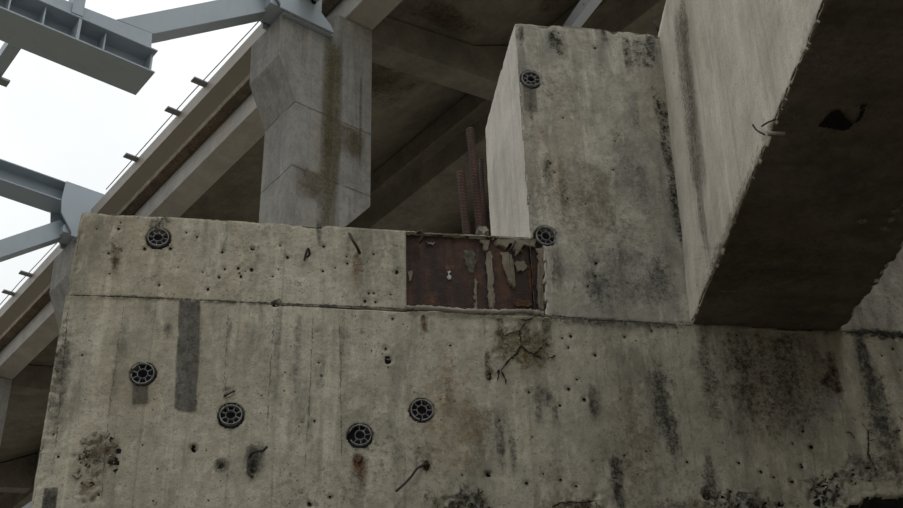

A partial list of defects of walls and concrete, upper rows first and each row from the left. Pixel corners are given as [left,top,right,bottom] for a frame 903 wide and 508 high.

spalling [818,104,868,131]
crack [496,314,690,385]
damp [807,333,903,508]
peeling [78,431,121,473]
peeling [804,474,840,508]